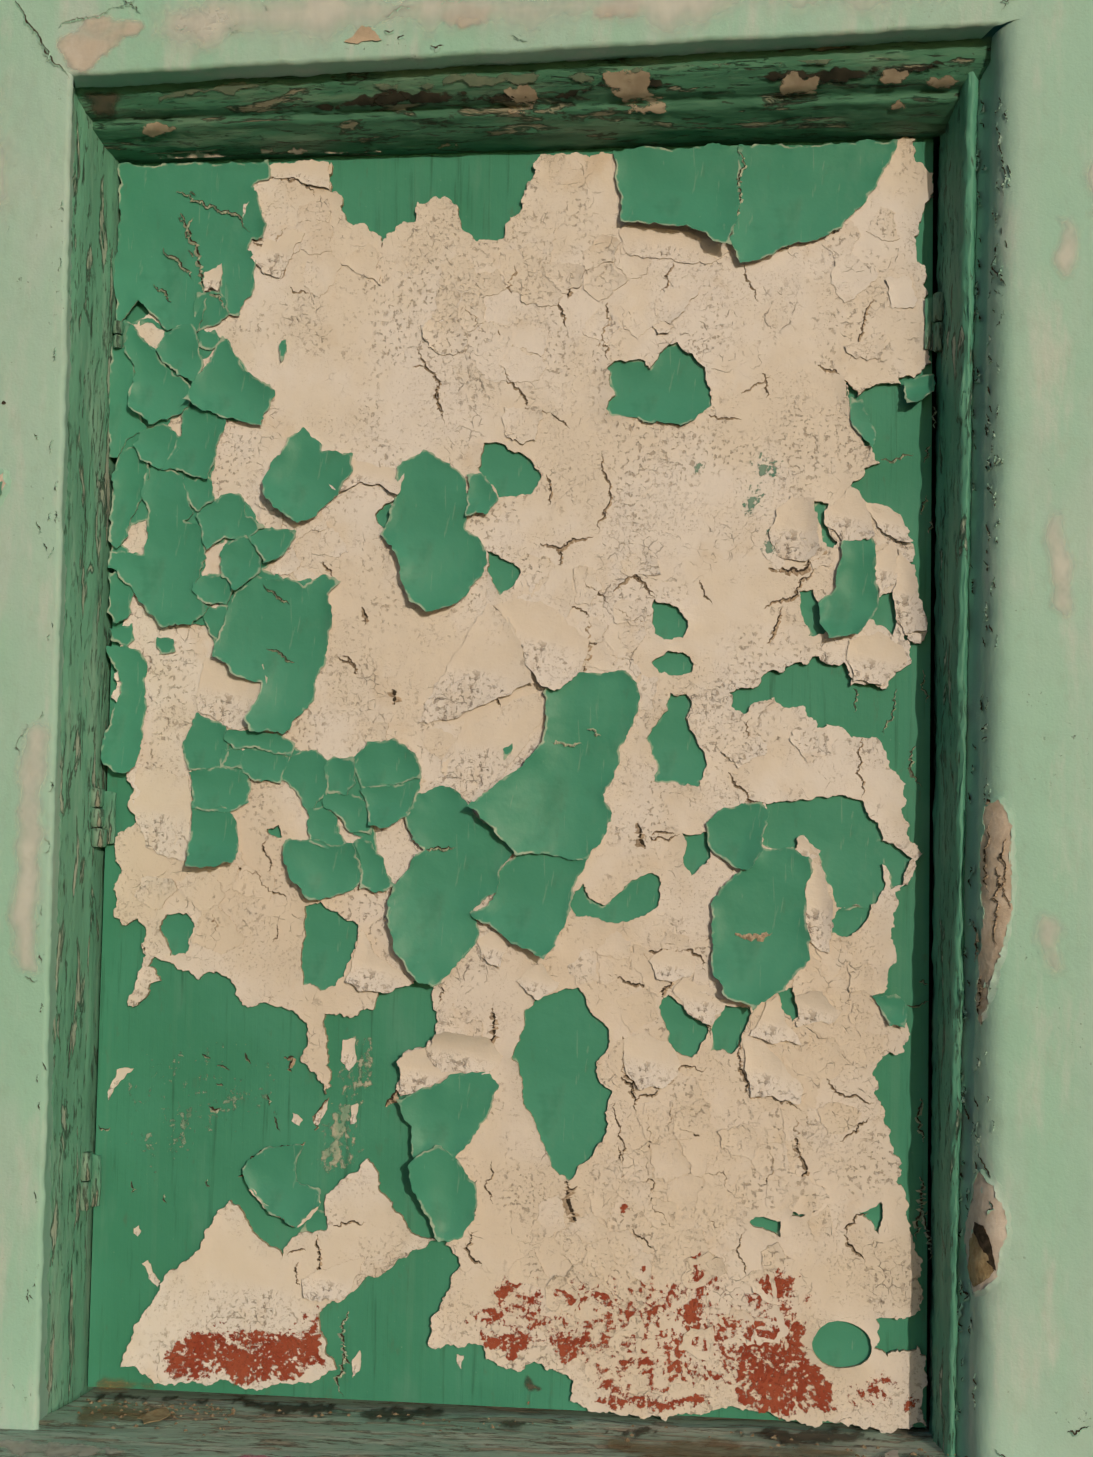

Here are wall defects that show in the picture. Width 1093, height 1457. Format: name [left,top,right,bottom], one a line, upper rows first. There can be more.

peeling [569,67,666,114]
peeling [780,59,832,95]
crack [154,191,307,309]
crack [557,289,611,360]
crack [414,349,445,423]
crack [540,453,655,672]
crack [764,551,828,643]
peeling [101,136,936,1457]
spalling [974,795,1019,1026]
spalling [961,1168,1013,1297]
corrosion [163,1306,326,1386]
corrosion [466,1253,919,1420]